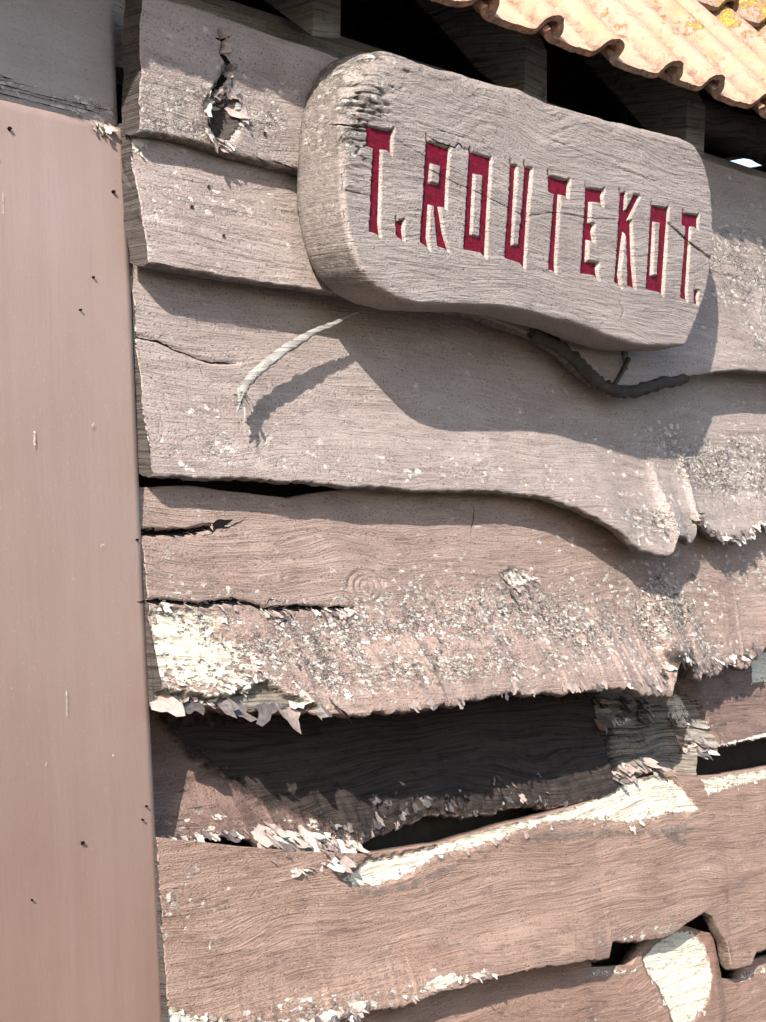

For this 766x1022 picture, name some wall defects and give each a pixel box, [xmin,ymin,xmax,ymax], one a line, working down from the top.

crack [209,35,238,103]
crack [136,334,237,374]
peeling [150,567,766,886]
peeling [402,968,498,1004]
peeling [592,931,712,1022]
peeling [168,1007,229,1022]
peeling [299,1000,370,1022]